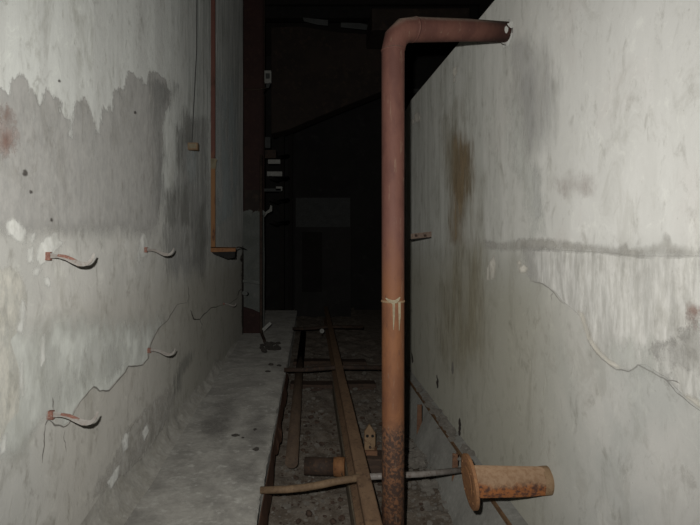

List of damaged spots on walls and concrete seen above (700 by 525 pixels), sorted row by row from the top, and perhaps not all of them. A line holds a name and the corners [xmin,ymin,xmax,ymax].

water stain [0,71,170,231]
rust [450,136,470,241]
crack [42,248,244,461]
crack [590,345,699,410]